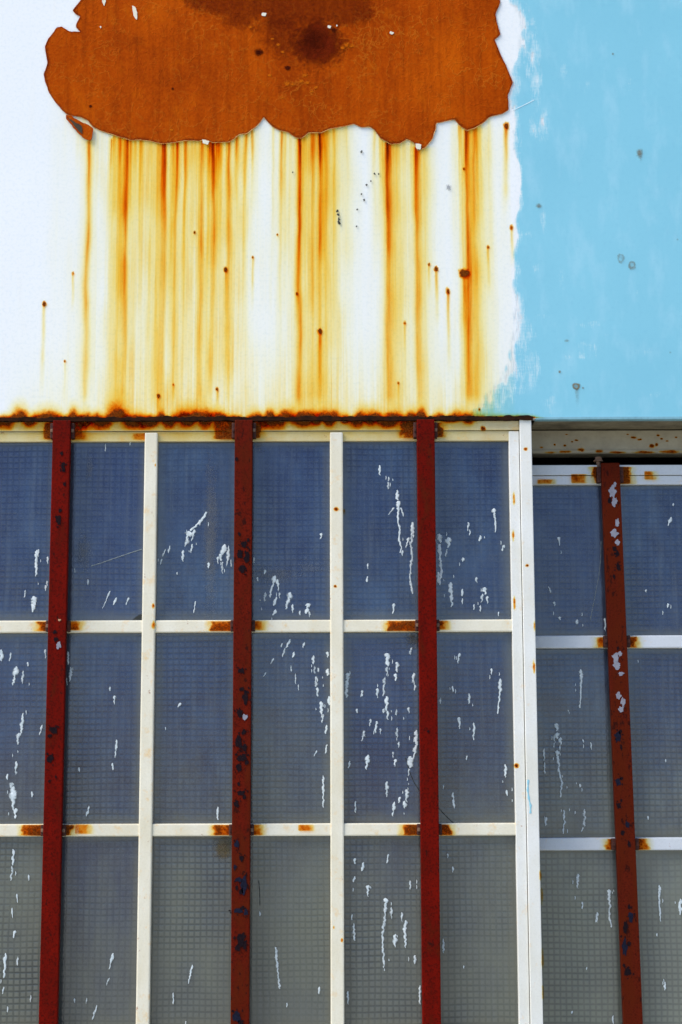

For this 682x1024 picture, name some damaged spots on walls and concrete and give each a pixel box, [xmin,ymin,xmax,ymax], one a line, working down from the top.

corrosion [44,0,513,251]
corrosion [459,202,470,299]
corrosion [620,467,630,484]
corrosion [387,621,415,631]
corrosion [21,825,41,836]